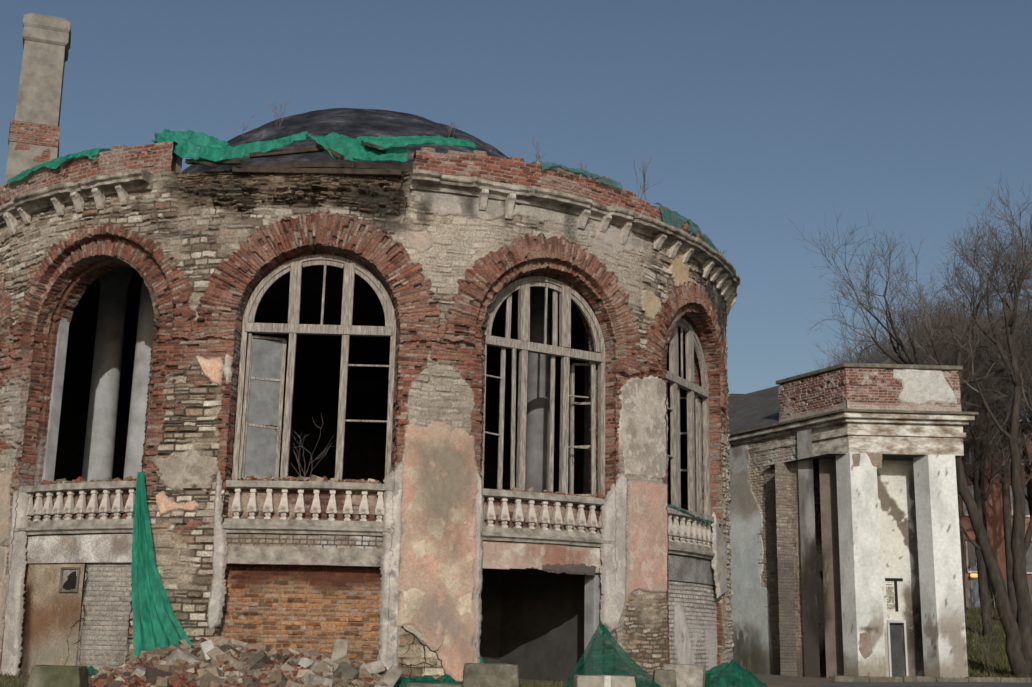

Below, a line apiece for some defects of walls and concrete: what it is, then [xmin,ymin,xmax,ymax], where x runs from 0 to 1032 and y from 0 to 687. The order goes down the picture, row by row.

spalling [14,142,50,162]
peeling [892,369,958,405]
peeling [0,471,29,676]
peeling [152,452,228,633]
crack [399,626,445,677]
peeling [377,420,484,682]
peeling [542,375,670,675]